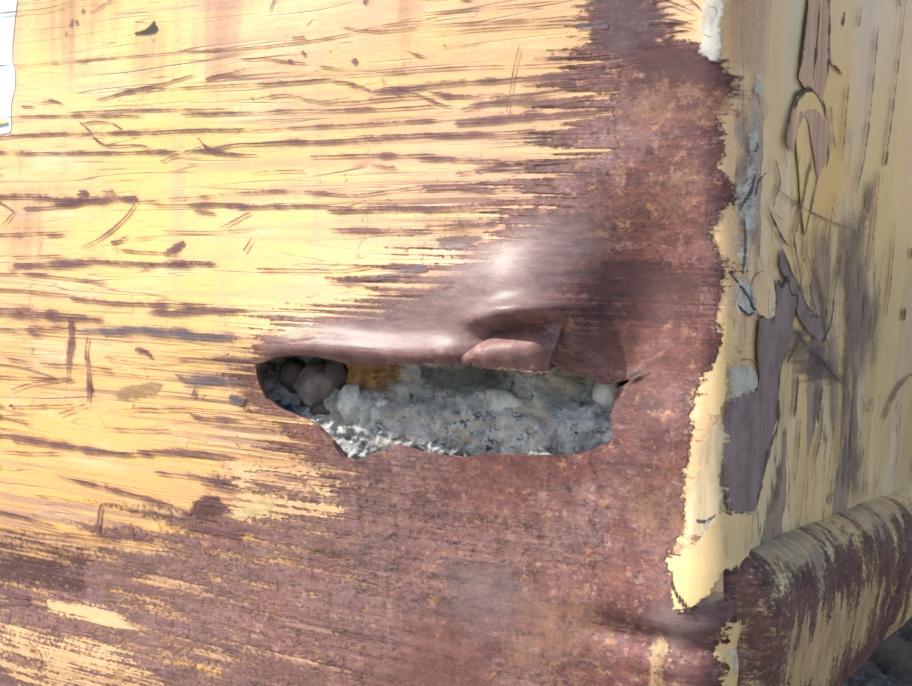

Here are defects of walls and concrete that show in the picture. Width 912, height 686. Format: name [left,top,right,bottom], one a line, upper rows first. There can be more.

rust [560,5,613,26]
rust [632,0,670,13]
rust [244,275,450,334]
peeling [671,0,880,612]
rust [115,382,162,400]
spalling [259,355,630,459]
rust [207,471,241,488]